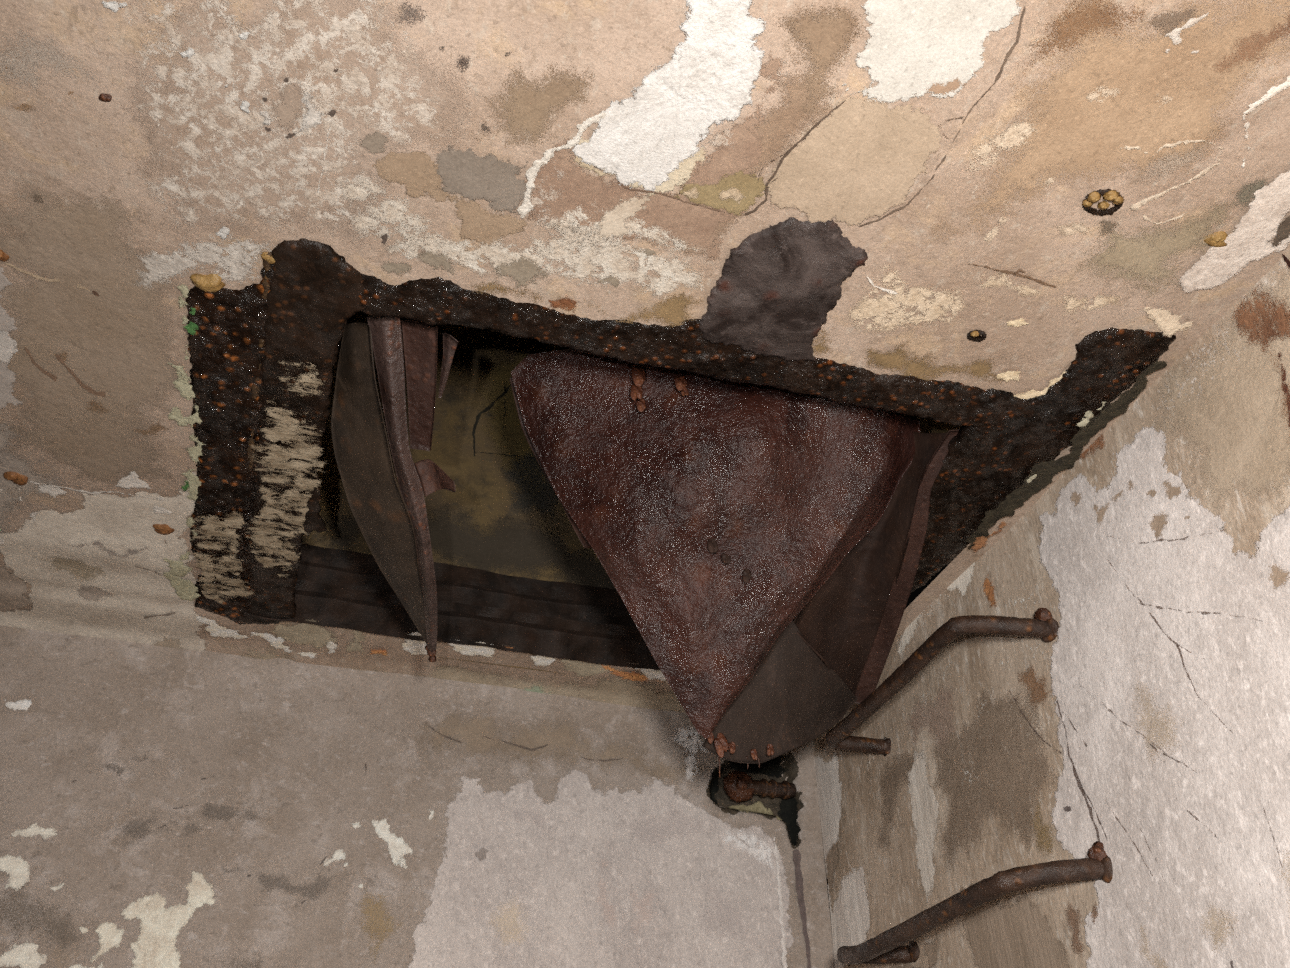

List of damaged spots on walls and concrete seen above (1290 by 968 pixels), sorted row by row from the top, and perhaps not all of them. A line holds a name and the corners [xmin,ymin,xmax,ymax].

peeling [102,0,1022,299]
crack [859,6,1026,227]
water stain [471,280,543,303]
corrosion [549,296,580,314]
water stain [584,291,704,328]
water stain [861,341,1003,384]
corrosion [967,329,987,342]
peeling [1179,170,1290,298]
corrosion [1231,285,1290,446]
peeling [891,313,1290,968]
crack [1107,529,1288,733]
crack [1009,690,1170,895]